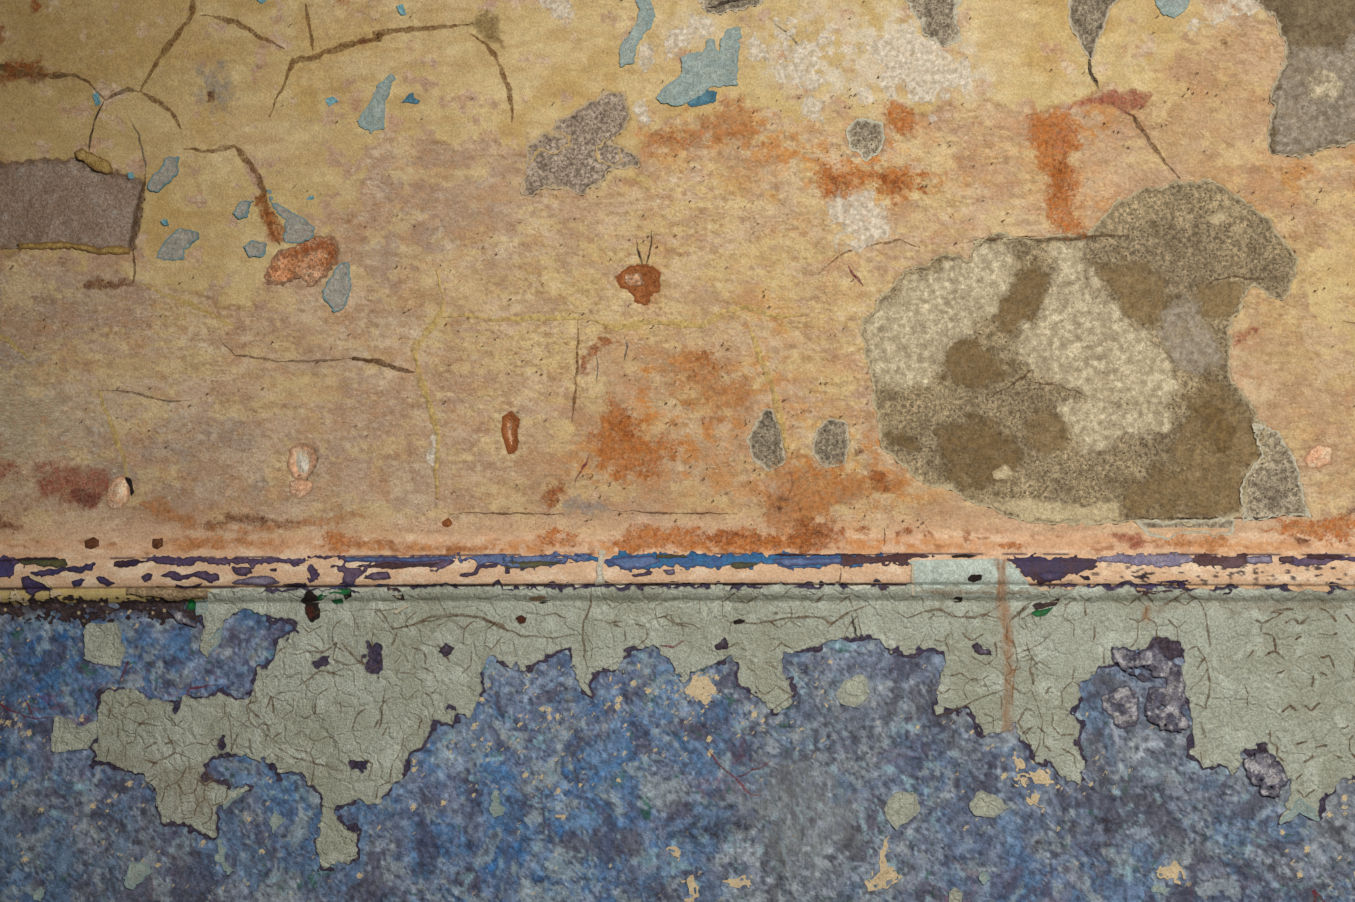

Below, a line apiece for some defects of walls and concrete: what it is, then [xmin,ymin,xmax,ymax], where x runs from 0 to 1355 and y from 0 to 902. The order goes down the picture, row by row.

crack [708,0,740,8]
spalling [1252,0,1355,159]
spalling [0,148,180,255]
crack [0,2,806,516]
spalling [520,91,639,200]
corrosion [814,164,928,205]
corrosion [1026,113,1086,239]
corrosion [588,396,677,484]
peeling [0,178,1355,875]
corrosion [613,450,900,554]
crack [103,575,1211,824]
crack [1245,608,1355,798]